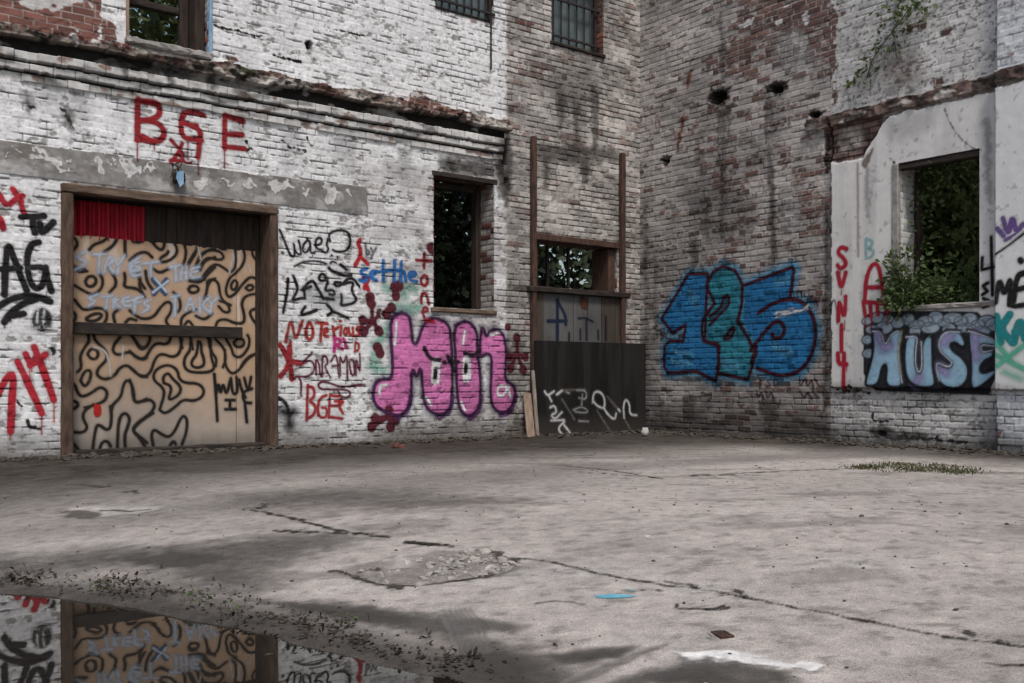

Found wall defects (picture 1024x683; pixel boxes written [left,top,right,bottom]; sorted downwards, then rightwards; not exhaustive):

flaking render [0,0,132,50]
flaking render [731,0,845,120]
hole [707,86,732,106]
damp [537,87,616,188]
peeling [5,146,74,173]
peeling [94,155,156,178]
peeling [185,174,352,205]
damp [689,240,698,267]